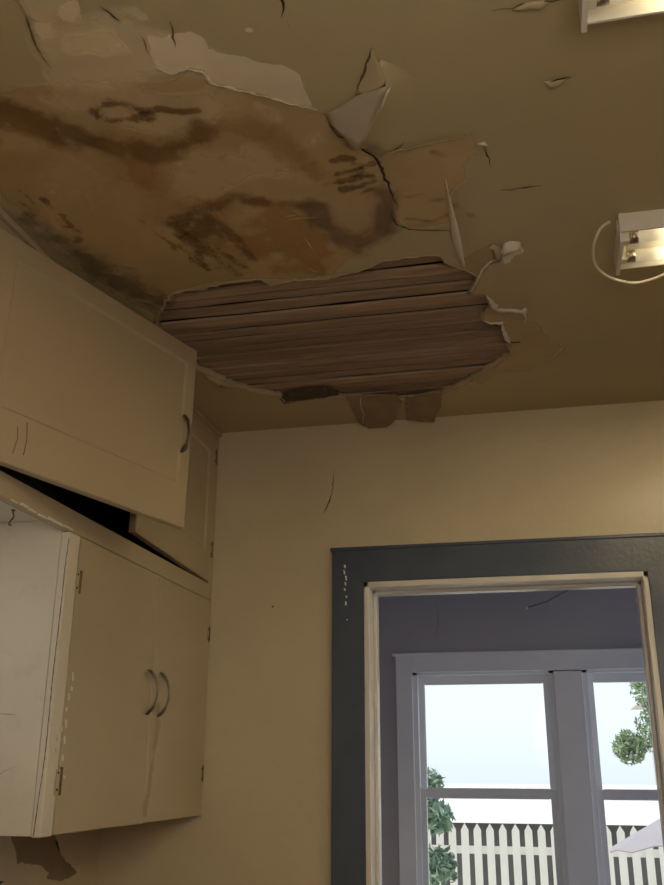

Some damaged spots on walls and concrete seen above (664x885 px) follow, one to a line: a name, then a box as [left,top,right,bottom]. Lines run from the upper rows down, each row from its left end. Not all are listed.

crack [14,0,47,63]
crack [493,0,560,11]
peeling [148,32,317,110]
water stain [0,68,396,313]
spalling [154,179,524,429]
peeling [10,835,76,881]